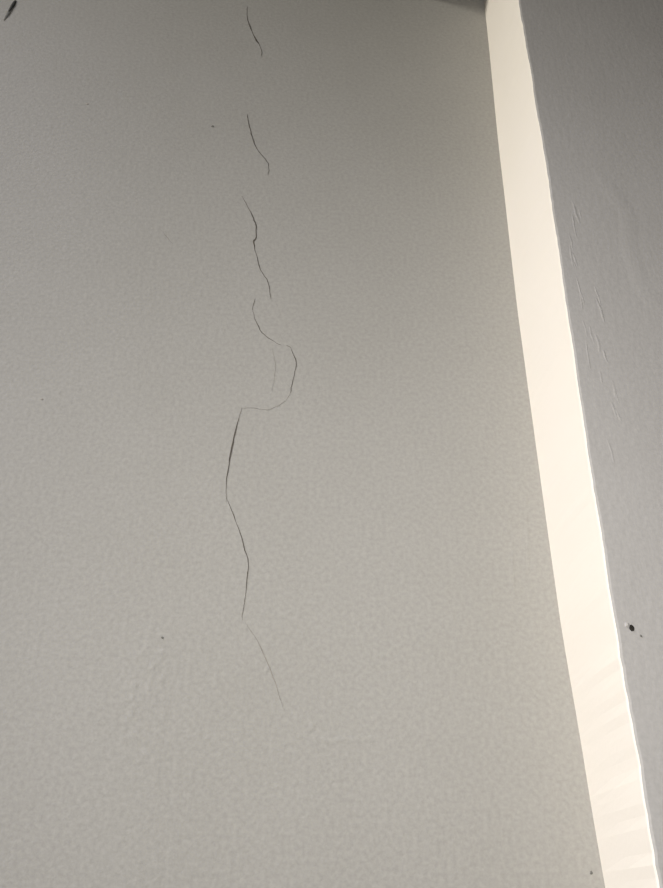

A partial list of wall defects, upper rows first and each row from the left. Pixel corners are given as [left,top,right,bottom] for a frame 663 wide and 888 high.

crack [247,114,269,173]
crack [226,200,297,707]